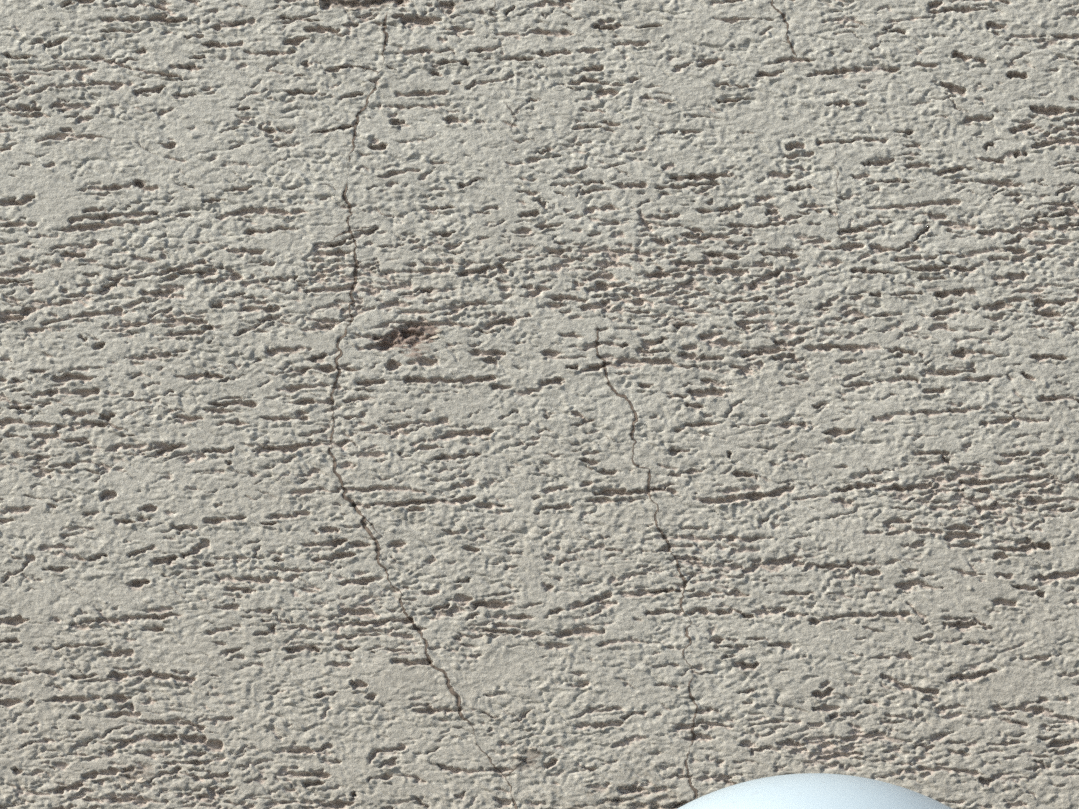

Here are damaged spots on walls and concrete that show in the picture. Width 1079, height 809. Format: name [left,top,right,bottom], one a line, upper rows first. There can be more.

crack [312,11,543,809]
crack [595,327,713,809]